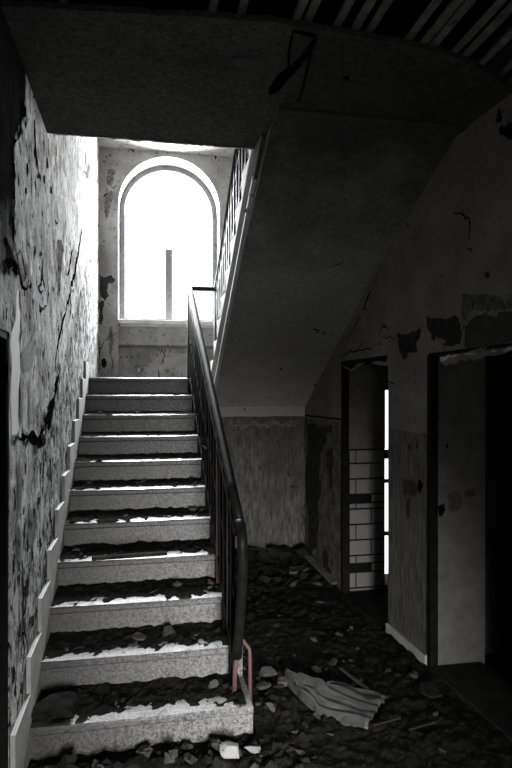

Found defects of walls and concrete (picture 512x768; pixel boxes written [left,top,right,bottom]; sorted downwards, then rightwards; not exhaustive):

spalling [2,99,28,278]
crack [20,261,45,295]
crack [55,230,82,362]
peeling [99,273,116,324]
crack [339,291,395,358]
spalling [397,287,512,367]